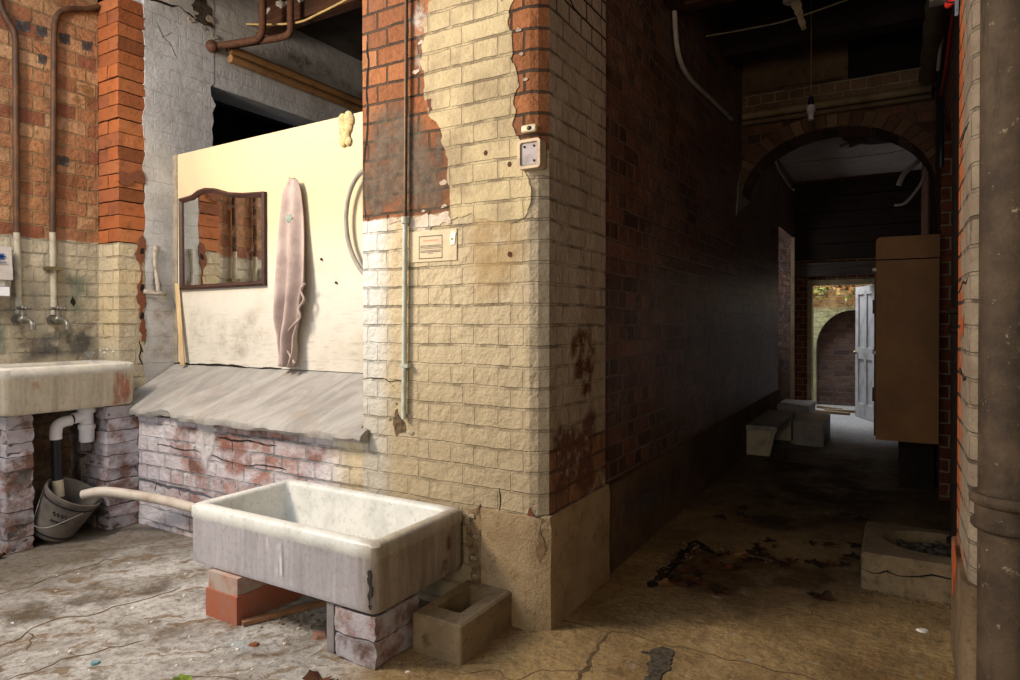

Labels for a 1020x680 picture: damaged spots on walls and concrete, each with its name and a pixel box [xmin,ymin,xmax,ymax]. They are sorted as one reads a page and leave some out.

peeling [389,0,532,231]
spalling [135,235,147,342]
crack [0,555,127,594]
spalling [465,504,482,583]
peeling [527,507,547,564]
crack [860,562,951,581]
crack [0,587,180,680]
crack [445,620,815,680]